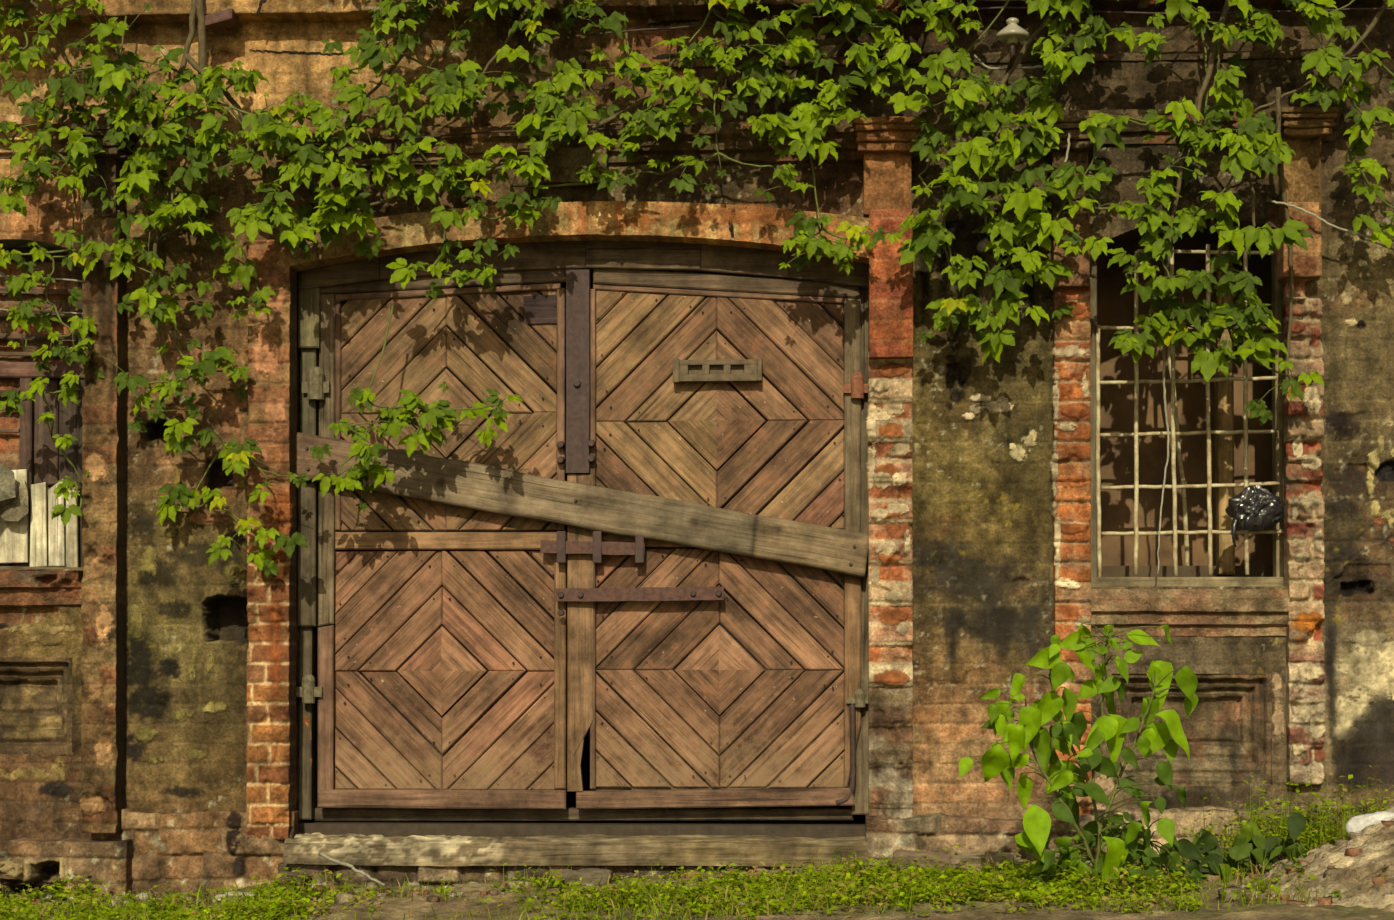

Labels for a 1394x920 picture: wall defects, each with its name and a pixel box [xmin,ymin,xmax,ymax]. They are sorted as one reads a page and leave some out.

flaking render [1345,235,1359,262]
flaking render [1341,294,1366,328]
spalling [1292,421,1394,547]
spalling [1295,531,1361,561]
water stain [139,532,243,618]
spalling [1337,577,1375,595]
water stain [125,637,180,718]
water stain [165,787,200,797]